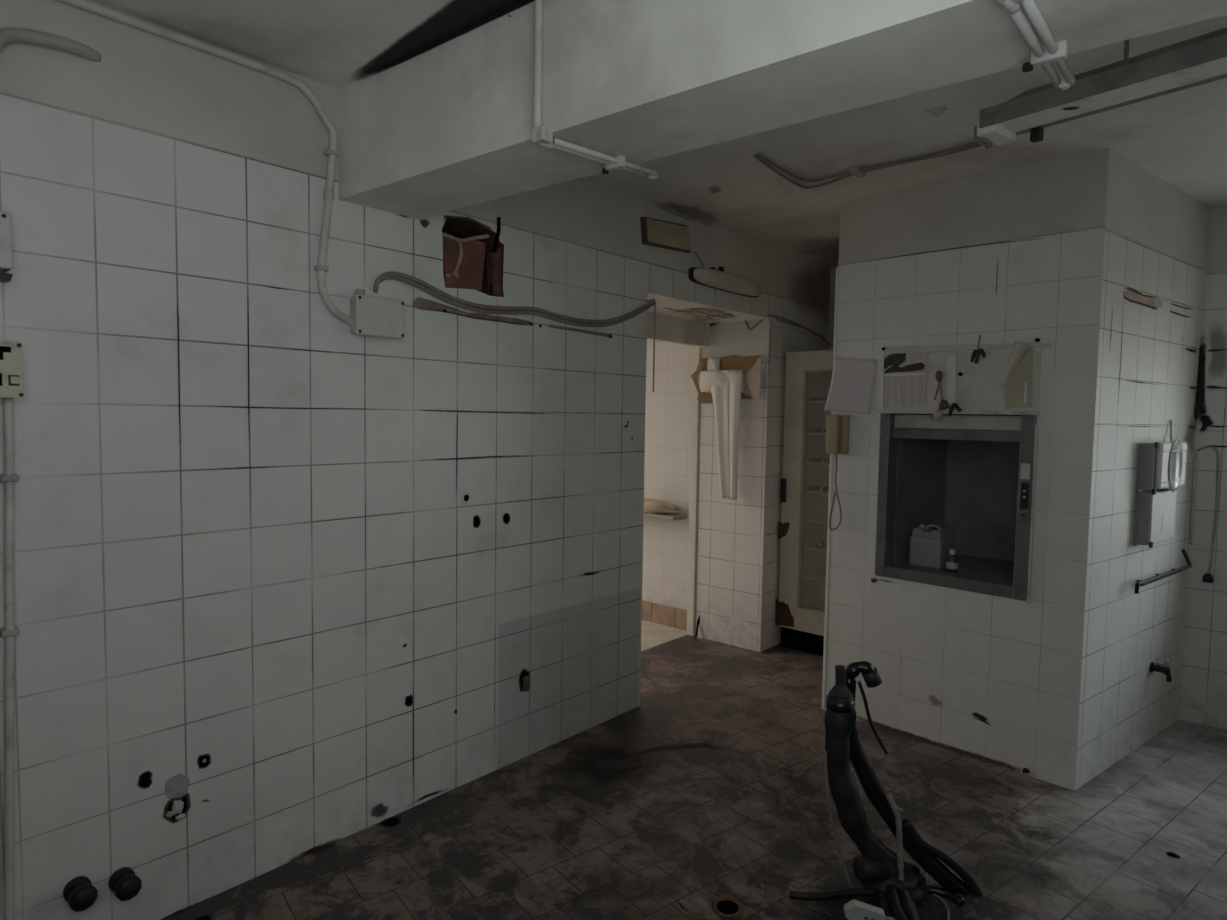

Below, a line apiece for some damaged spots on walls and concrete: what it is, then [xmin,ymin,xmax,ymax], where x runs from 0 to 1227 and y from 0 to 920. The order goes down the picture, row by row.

rust [776,599,794,627]